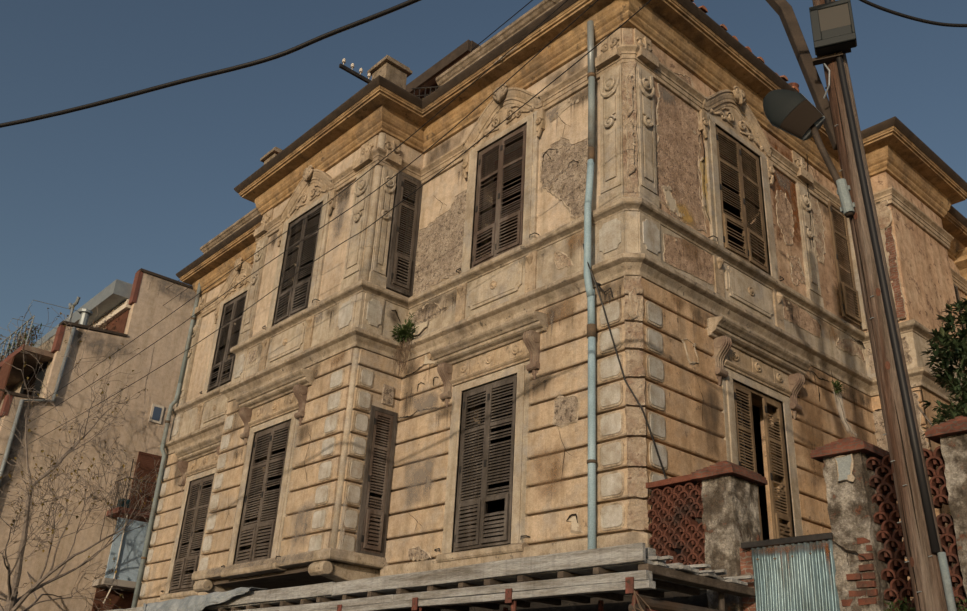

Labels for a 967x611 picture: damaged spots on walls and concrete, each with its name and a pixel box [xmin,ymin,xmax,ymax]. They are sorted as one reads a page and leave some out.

flaking render [540,136,588,219]
peeling [661,185,685,218]
flaking render [699,156,710,221]
flaking render [412,189,467,296]
spalling [409,302,449,337]
flaking render [872,410,889,452]
flaking render [912,392,929,460]